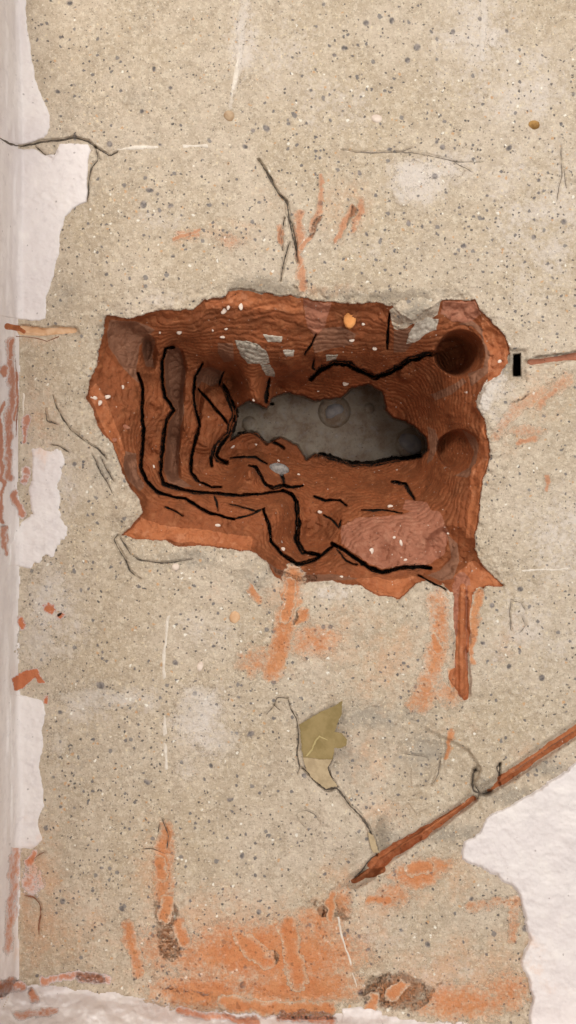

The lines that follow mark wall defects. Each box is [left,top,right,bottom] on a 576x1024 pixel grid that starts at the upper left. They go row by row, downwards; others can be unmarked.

peeling [0,0,91,321]
crack [0,137,118,202]
crack [258,160,298,280]
corrosion [0,336,31,556]
peeling [9,447,67,568]
crack [114,535,192,579]
corrosion [232,563,344,684]
spalling [86,290,510,599]
crack [267,697,377,878]
corrosion [0,970,112,1021]
corrosion [119,819,533,1024]
peeling [461,762,576,1024]